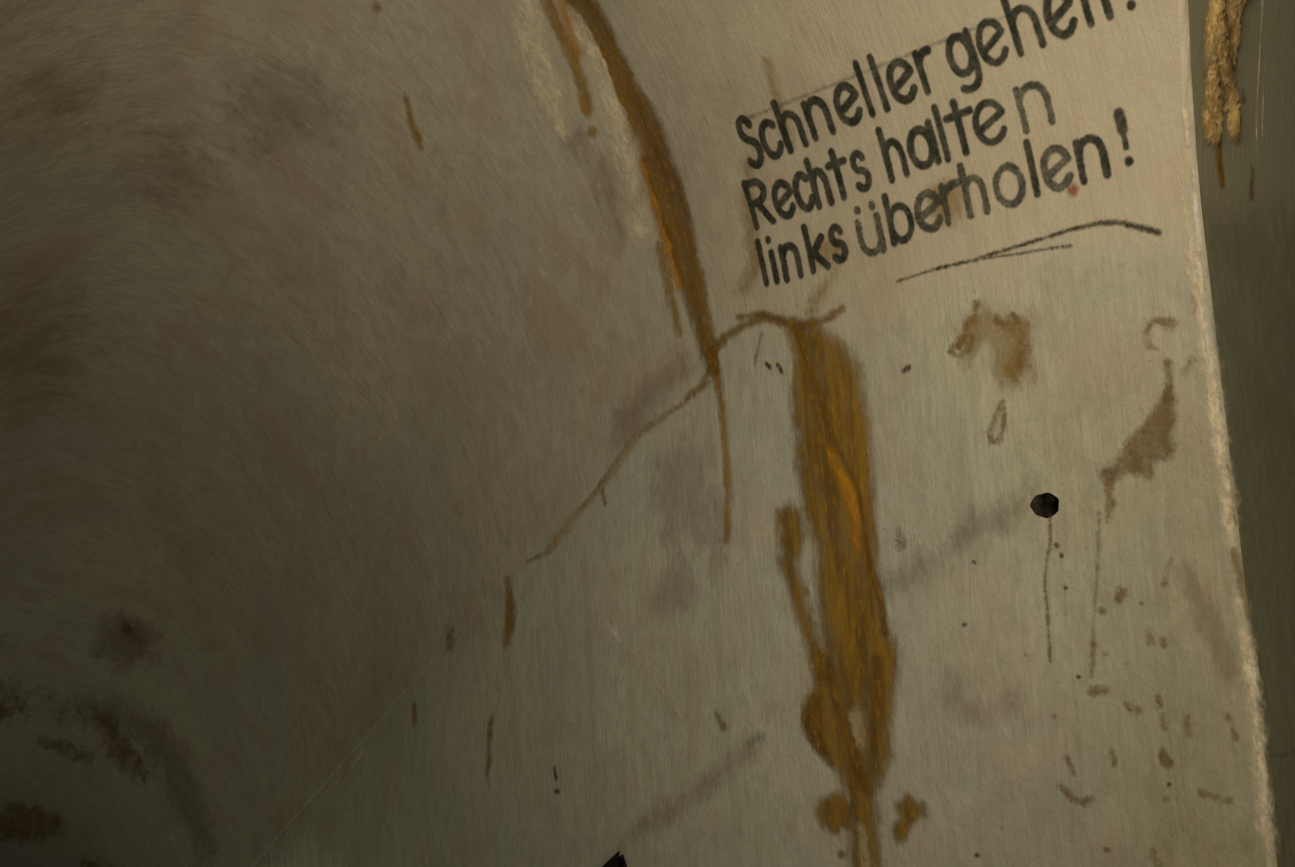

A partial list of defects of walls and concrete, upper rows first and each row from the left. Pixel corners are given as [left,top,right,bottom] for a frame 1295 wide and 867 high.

rust [542,0,897,867]
water stain [1103,360,1174,516]
rust [503,576,515,644]
rust [894,795,924,840]